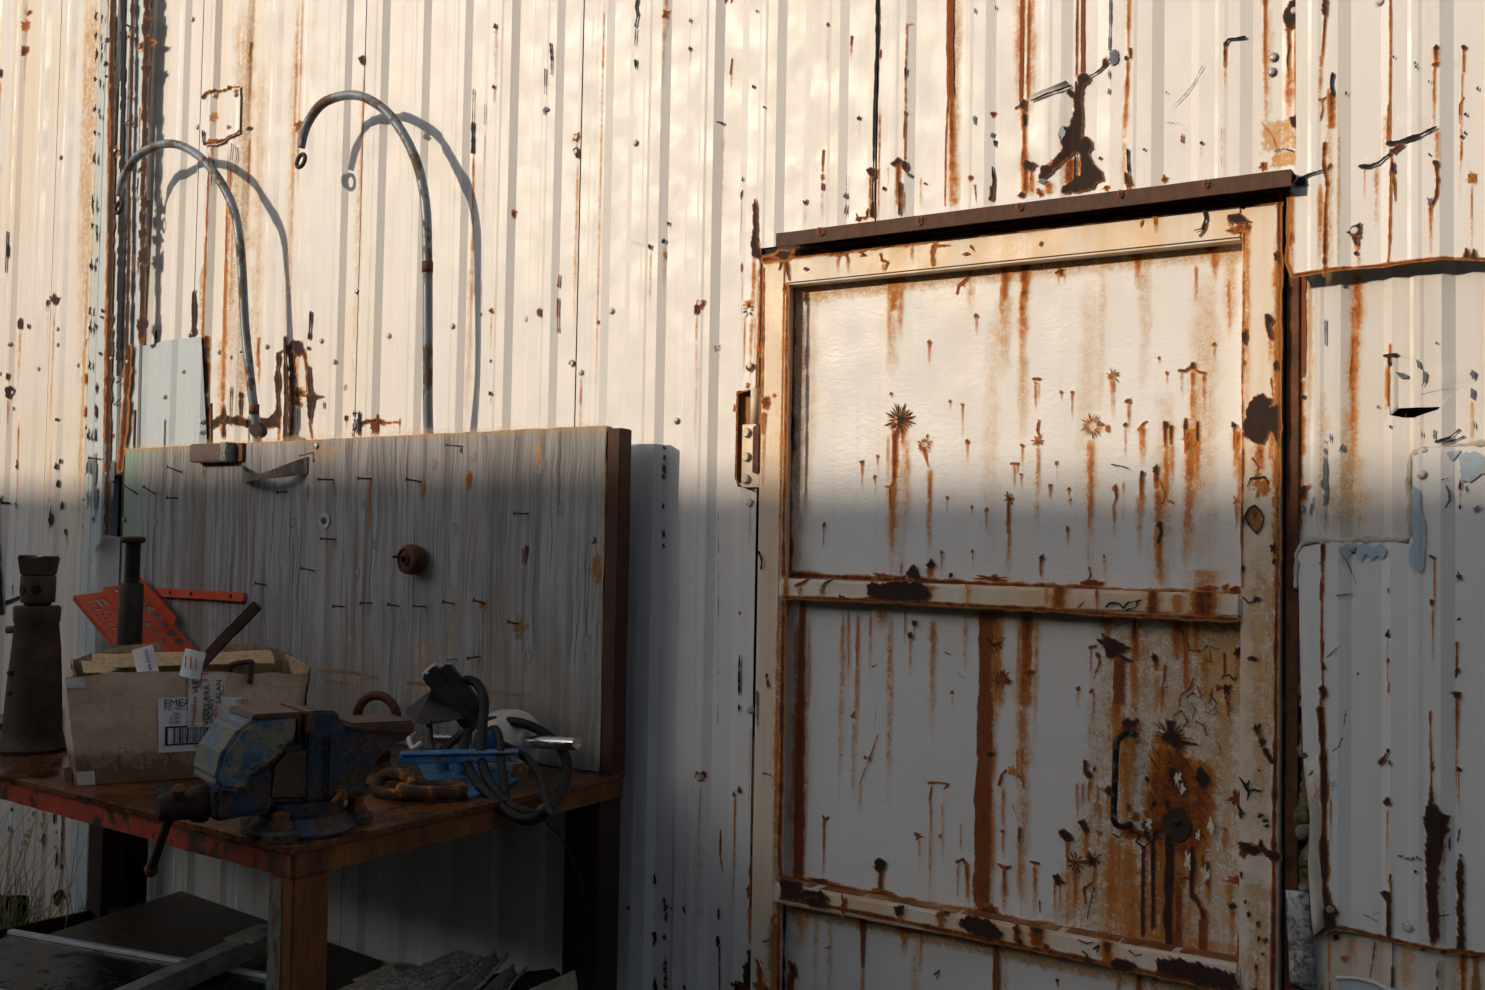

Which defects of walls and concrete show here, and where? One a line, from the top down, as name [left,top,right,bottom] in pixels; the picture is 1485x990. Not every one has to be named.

corrosion [291,4,303,186]
corrosion [48,0,157,543]
corrosion [200,126,325,441]
peeling [1409,486,1426,572]